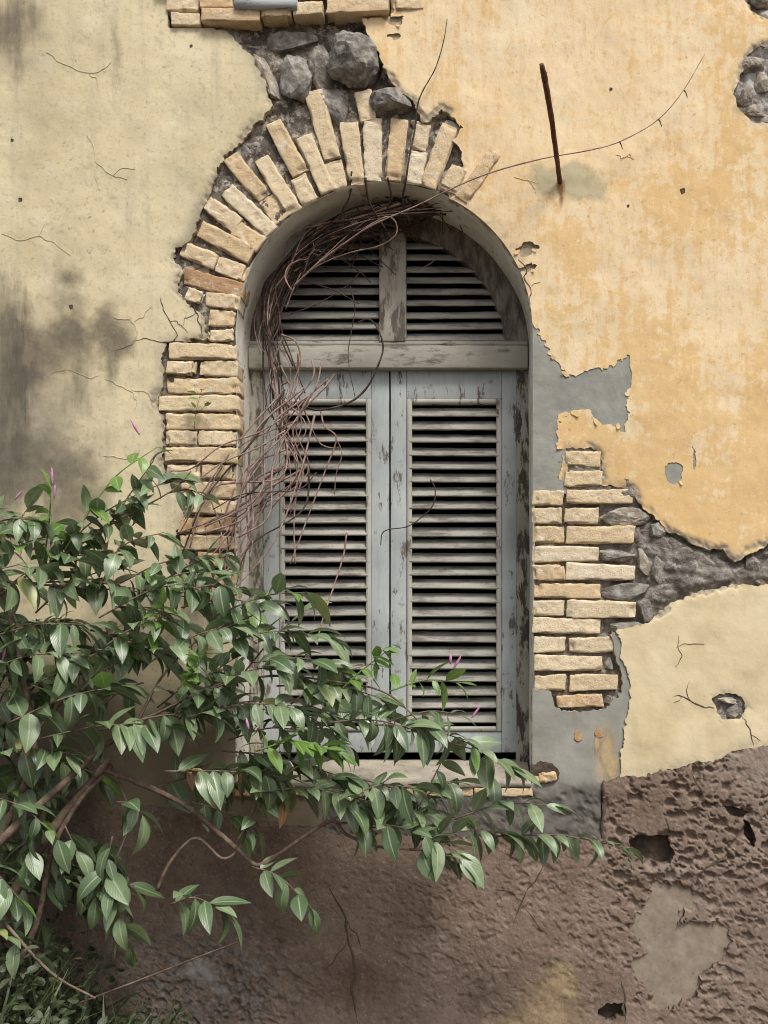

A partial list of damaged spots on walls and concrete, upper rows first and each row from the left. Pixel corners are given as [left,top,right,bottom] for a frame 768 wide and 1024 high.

spalling [733,46,768,123]
peeling [514,243,539,273]
crack [114,298,203,351]
spalling [158,0,500,602]
spalling [530,325,768,711]
crack [675,635,713,708]
spalling [712,693,745,719]
spalling [530,761,560,784]
spalling [629,879,733,1009]